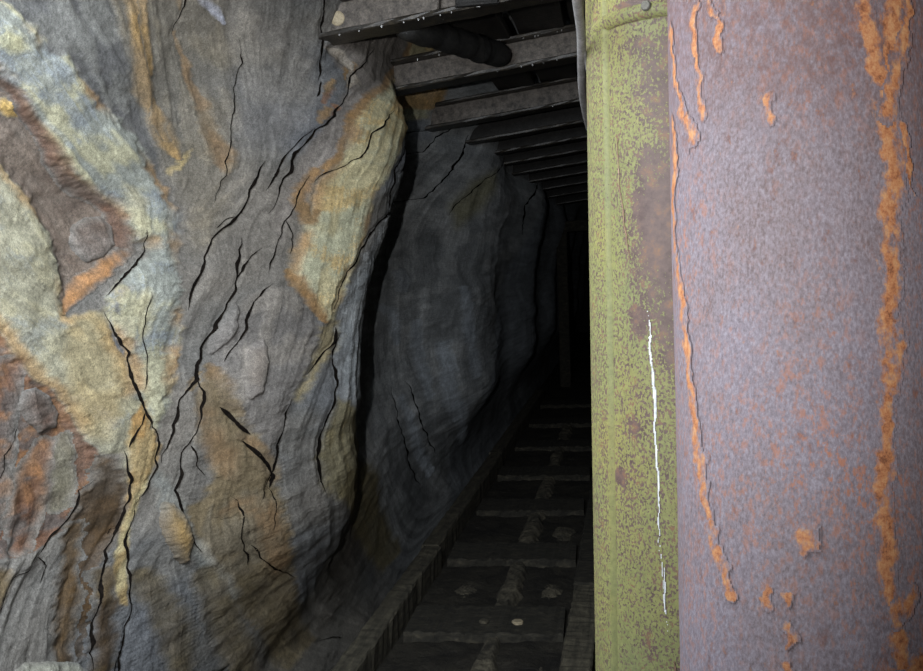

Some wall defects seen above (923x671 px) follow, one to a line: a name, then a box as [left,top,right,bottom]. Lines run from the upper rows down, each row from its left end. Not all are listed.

rust [758,91,776,126]
crack [451,162,504,211]
crack [89,0,468,671]
rust [668,0,738,603]
rust [852,0,923,671]
rust [791,521,822,558]
rust [759,582,801,671]